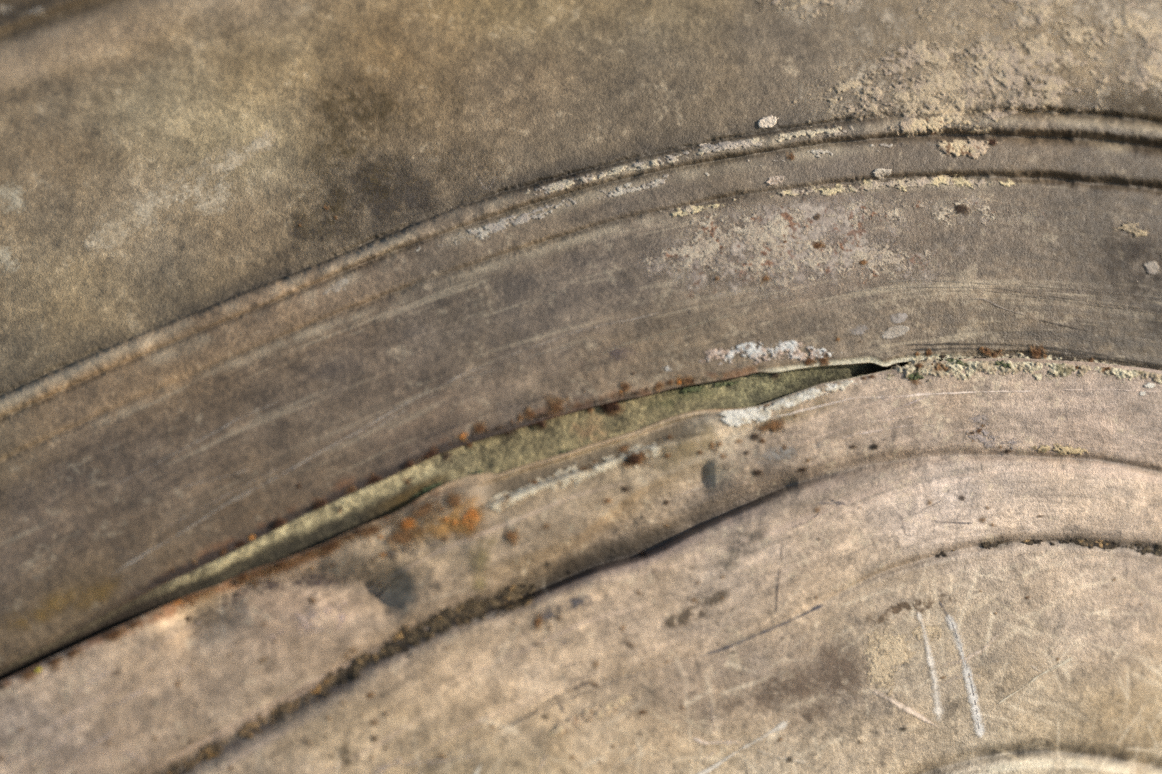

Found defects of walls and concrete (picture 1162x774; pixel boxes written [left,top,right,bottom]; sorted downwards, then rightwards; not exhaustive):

rust [587,372,694,413]
rust [403,397,564,484]
rust [617,445,651,467]
rust [736,414,797,455]
rust [220,535,255,556]
rust [272,486,355,530]
rust [304,492,480,569]
crack [0,360,934,682]